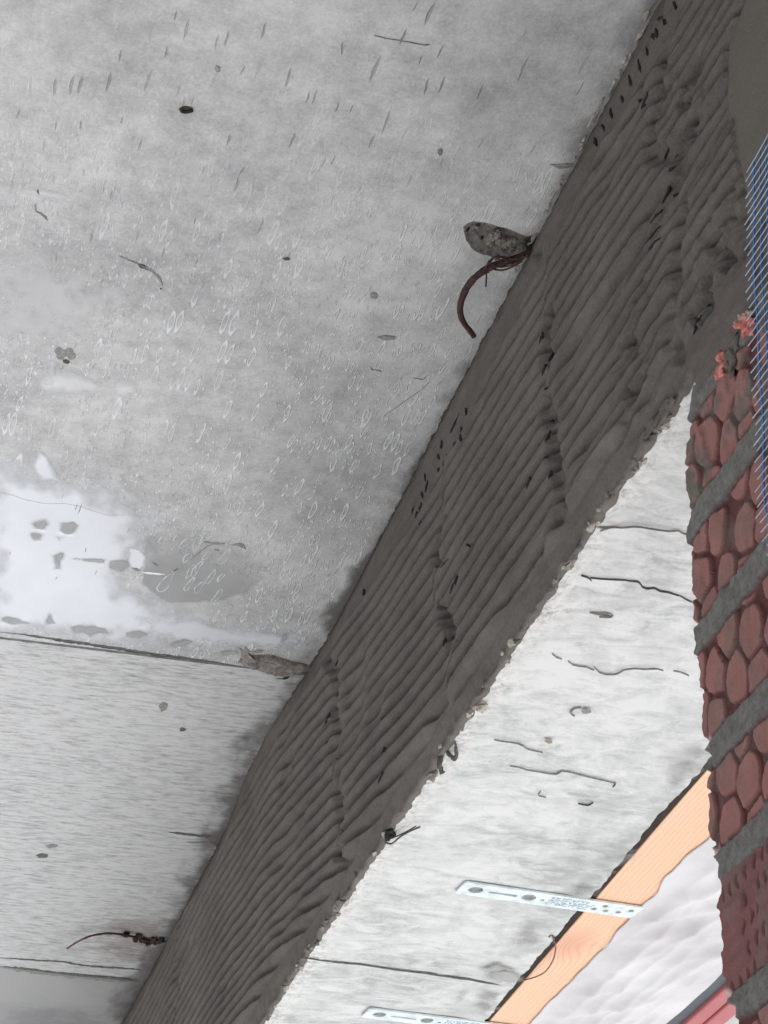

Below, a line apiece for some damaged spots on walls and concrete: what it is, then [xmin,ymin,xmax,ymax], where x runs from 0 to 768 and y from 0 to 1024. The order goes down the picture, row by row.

spalling [457,221,537,339]
crack [595,525,686,535]
damp [0,452,294,645]
crack [581,574,693,603]
peeling [73,626,107,635]
spalling [222,647,310,680]
crack [552,653,700,681]
crack [494,739,616,787]